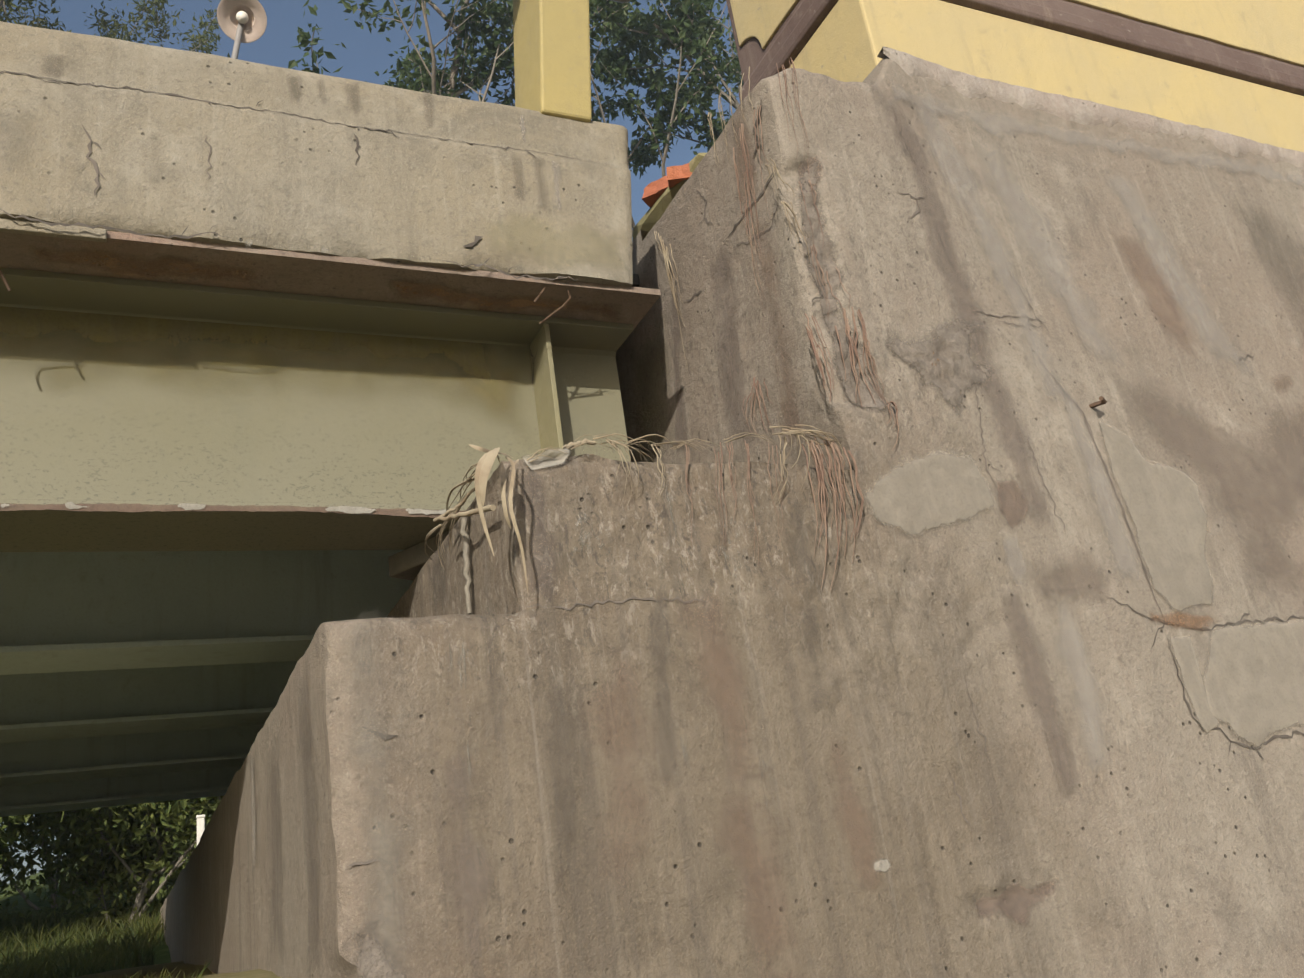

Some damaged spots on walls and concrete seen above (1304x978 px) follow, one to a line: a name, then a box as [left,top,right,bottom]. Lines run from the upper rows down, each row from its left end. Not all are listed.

crack [3,125,230,239]
crack [0,71,614,166]
crack [696,103,778,248]
crack [1103,594,1304,758]